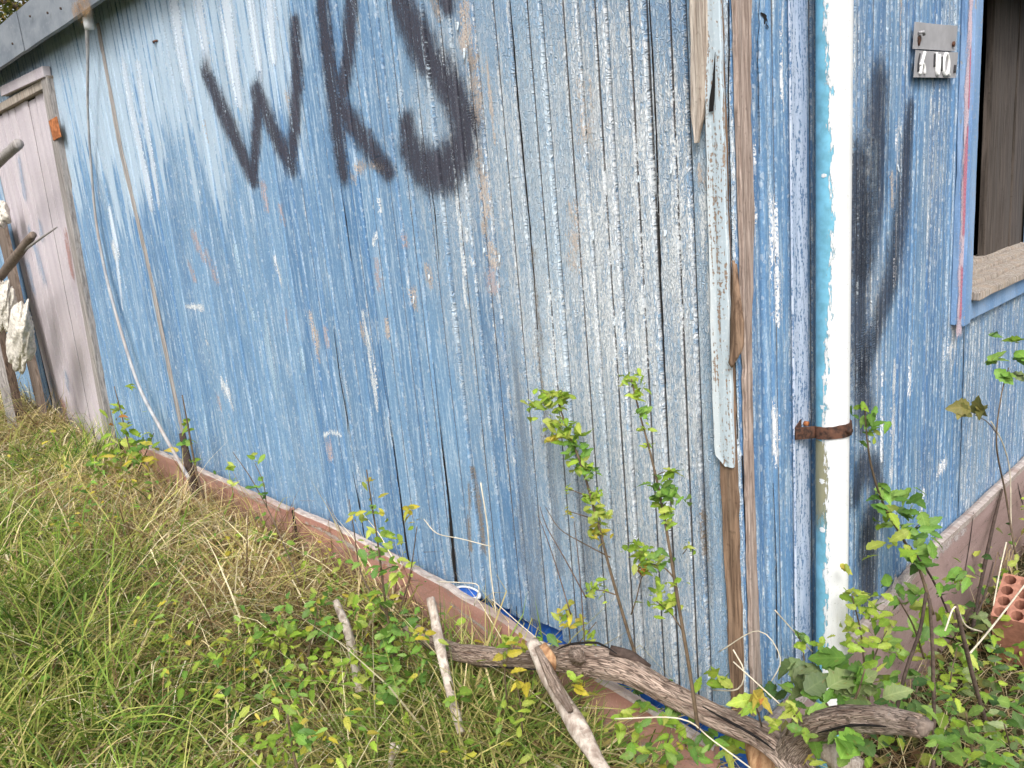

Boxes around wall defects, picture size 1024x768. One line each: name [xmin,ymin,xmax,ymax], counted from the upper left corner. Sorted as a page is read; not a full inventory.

crack [433,362,458,582]
peeling [536,69,710,431]
peeling [754,194,783,328]
peeling [771,401,780,468]
peeling [808,0,854,655]
peeling [880,339,912,484]